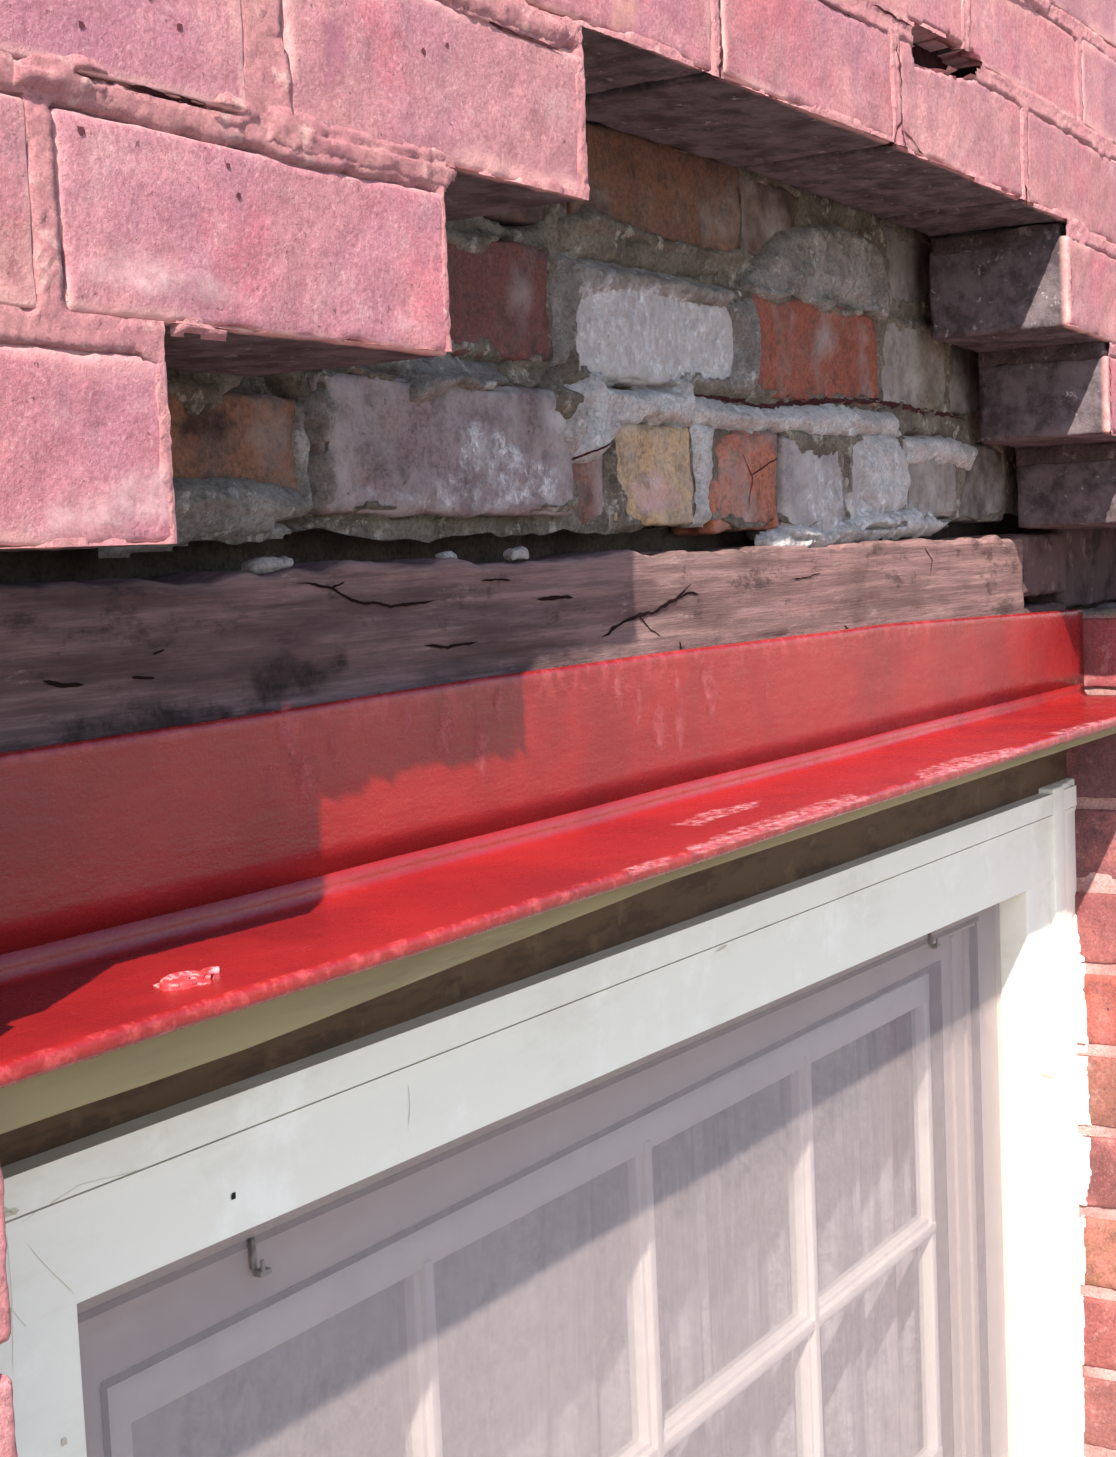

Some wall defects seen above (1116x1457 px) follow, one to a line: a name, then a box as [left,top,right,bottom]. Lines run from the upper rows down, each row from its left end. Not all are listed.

peeling [912,43,955,76]
spalling [98,120,1116,613]
crack [297,582,439,608]
crack [482,578,573,601]
crack [602,584,698,650]
crack [424,641,477,649]
crack [132,649,165,679]
crack [43,680,84,688]